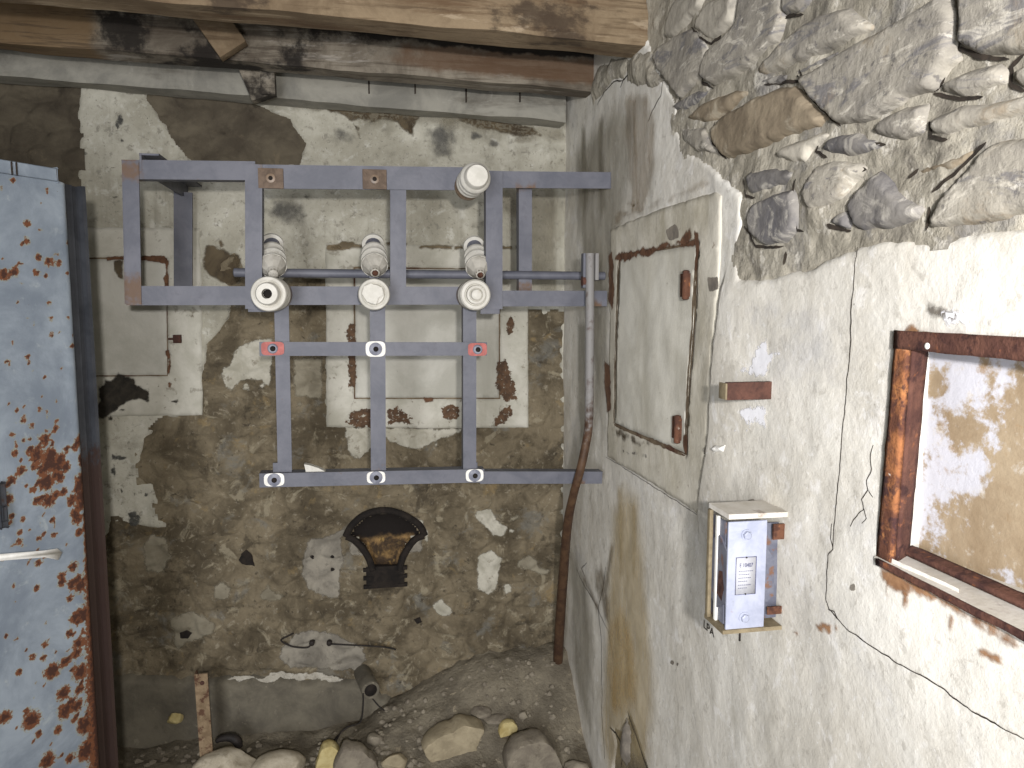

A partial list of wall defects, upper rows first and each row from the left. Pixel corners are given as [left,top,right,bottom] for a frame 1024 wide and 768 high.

flaking render [146,95,306,165]
flaking render [591,0,1024,281]
flaking render [220,250,245,286]
flaking render [282,277,325,286]
rust [608,230,699,310]
rust [347,356,357,387]
rust [345,408,371,428]
rust [386,406,413,425]
rust [423,397,460,420]
rust [495,359,518,426]
flaking render [105,305,564,698]
crack [826,247,1024,739]